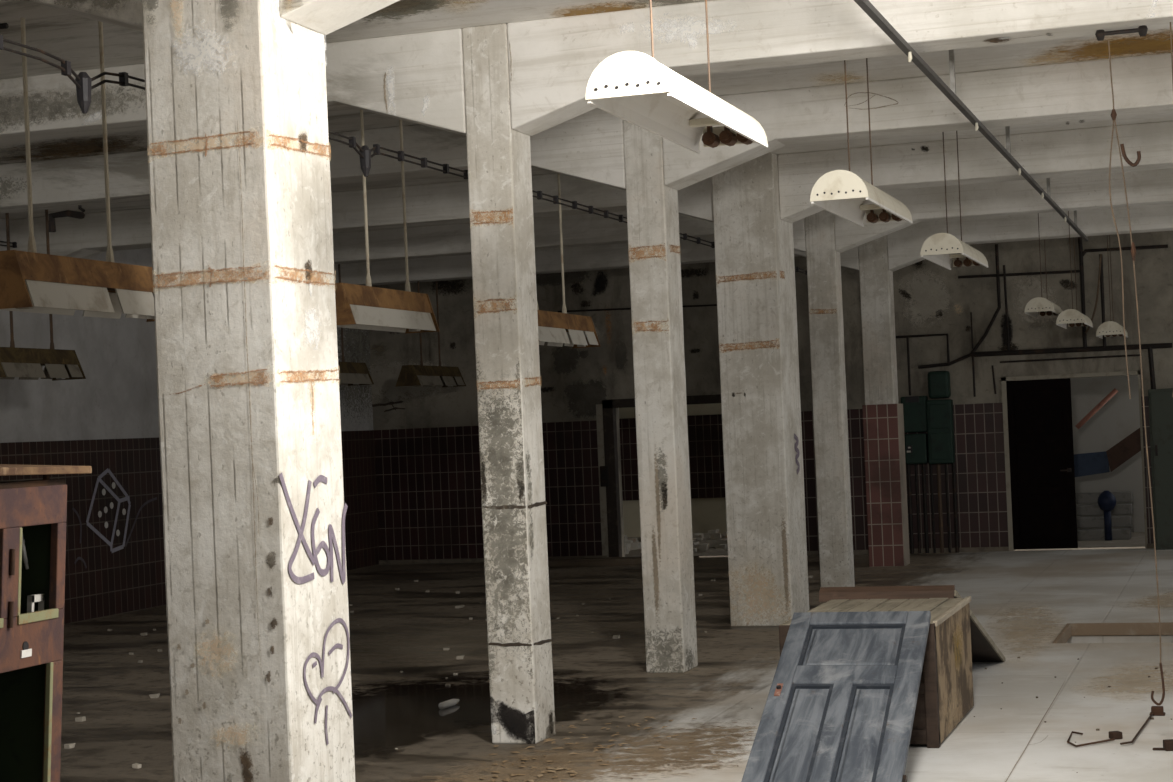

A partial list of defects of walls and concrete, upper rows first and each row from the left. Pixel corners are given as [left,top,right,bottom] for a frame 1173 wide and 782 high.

leakage [361,0,449,21]
leakage [556,0,699,17]
leakage [0,87,146,132]
corrosion [148,131,255,156]
corrosion [268,134,331,157]
leakage [0,138,148,198]
corrosion [153,265,335,288]
leakage [351,362,534,688]